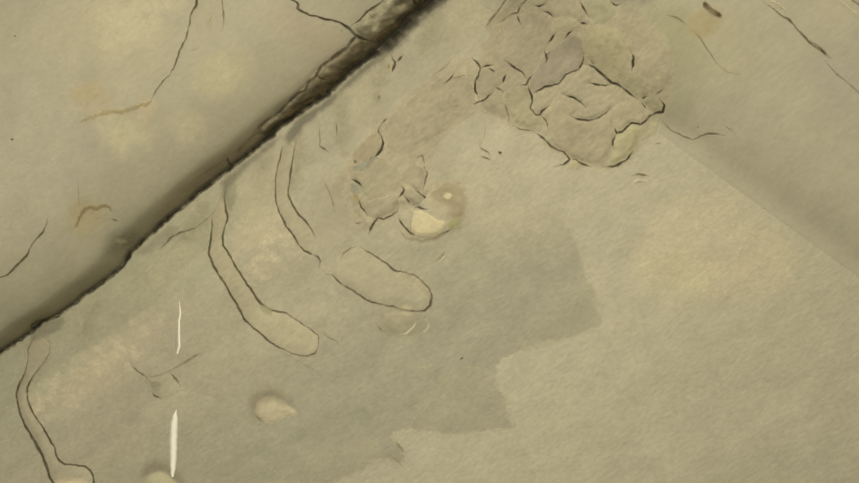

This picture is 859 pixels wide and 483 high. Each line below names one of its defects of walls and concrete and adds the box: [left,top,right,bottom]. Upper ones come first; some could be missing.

crack [0,0,446,354]
water stain [109,228,601,483]